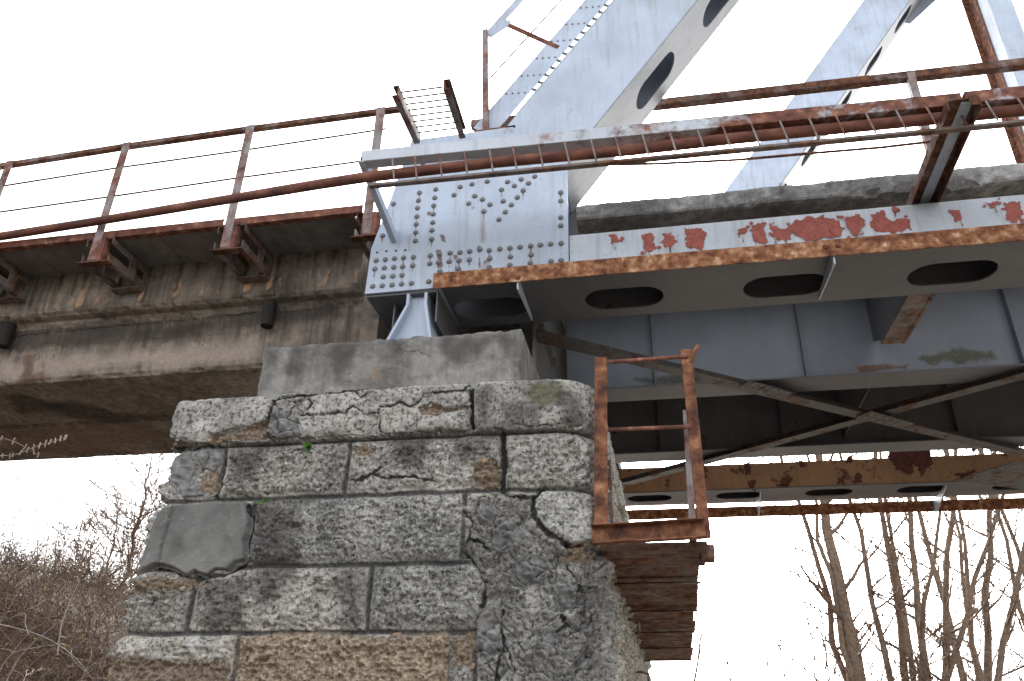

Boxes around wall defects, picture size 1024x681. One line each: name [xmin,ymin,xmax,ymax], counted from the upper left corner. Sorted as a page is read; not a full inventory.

peeling [640,228,707,255]
peeling [737,206,912,244]
peeling [948,209,963,227]
peeling [983,197,1024,223]
damp [921,350,993,364]
crack [267,386,475,432]
peeling [170,420,270,501]
crack [350,466,436,482]
spalling [472,457,503,491]
crack [500,429,593,659]
crack [463,512,515,681]